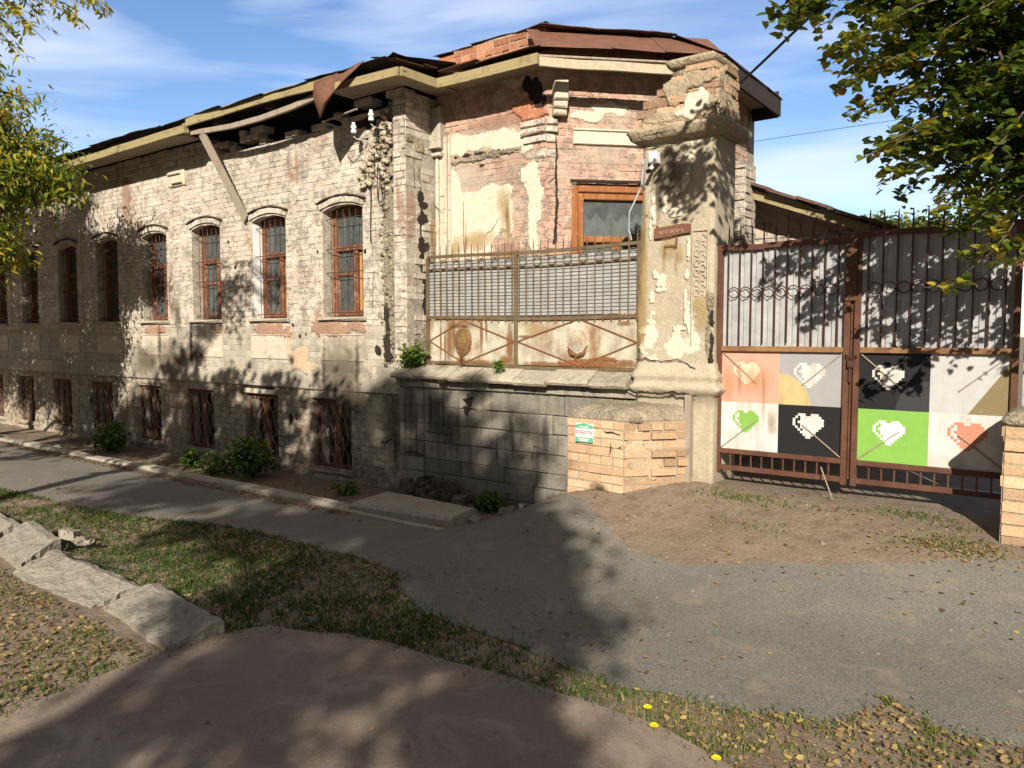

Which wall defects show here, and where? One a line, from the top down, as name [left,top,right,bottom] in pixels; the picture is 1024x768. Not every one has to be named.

flaking render [642,86,719,125]
peeling [649,137,695,240]
peeling [253,322,329,386]
spalling [311,308,367,337]
rust [440,315,538,366]
rust [584,360,633,368]
peeling [639,238,715,364]